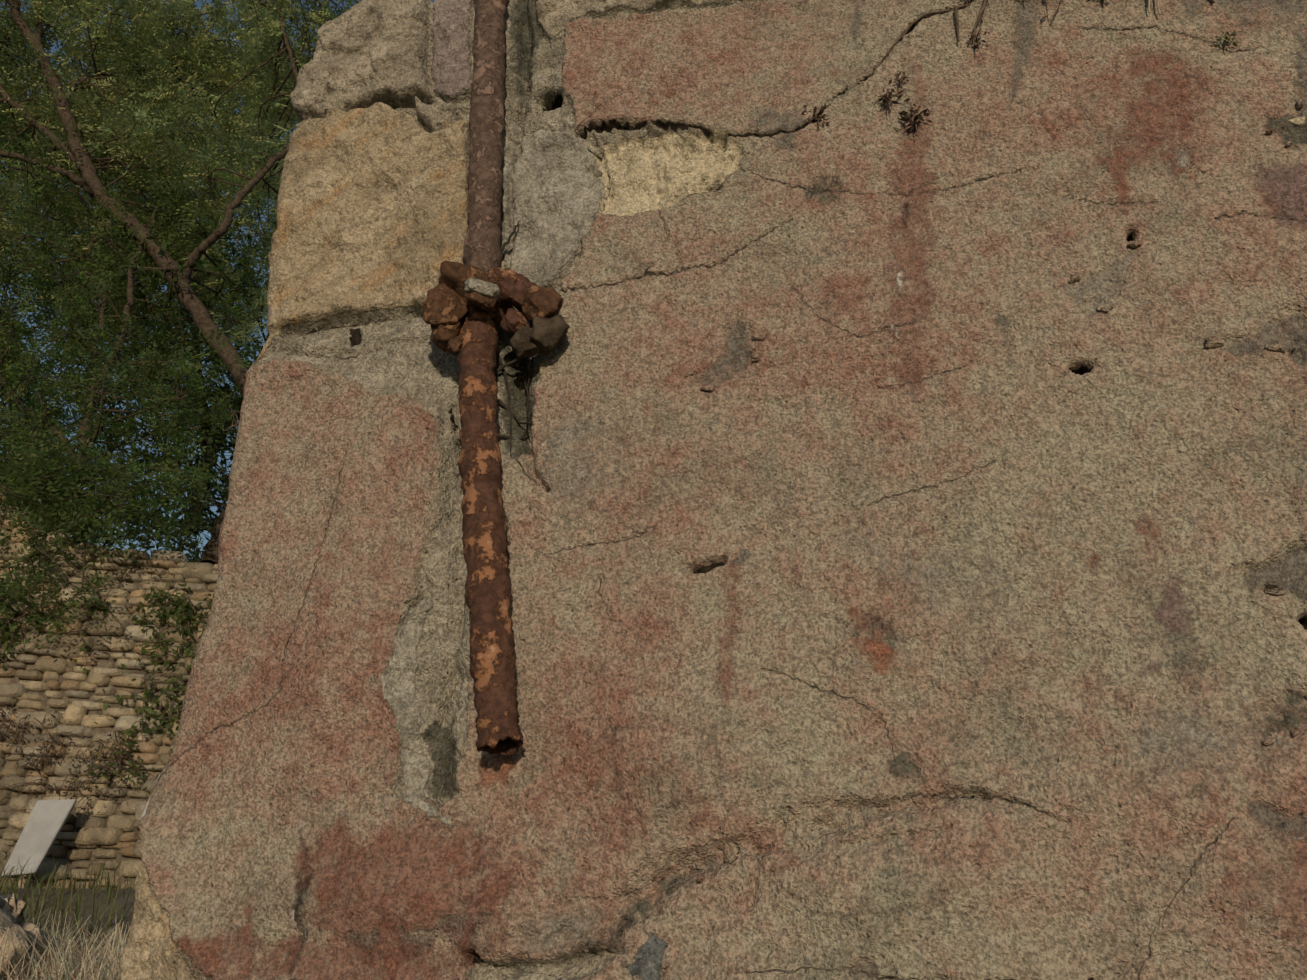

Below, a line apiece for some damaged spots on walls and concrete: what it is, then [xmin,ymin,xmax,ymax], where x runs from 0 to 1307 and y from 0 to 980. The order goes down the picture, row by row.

crack [1083,25,1260,52]
crack [575,0,1021,212]
spalling [586,129,745,217]
crack [1073,197,1159,205]
crack [1215,212,1305,222]
crack [558,209,793,292]
crack [794,289,917,337]
spalling [1204,315,1307,364]
spalling [1245,546,1307,598]
crack [157,442,348,780]
crack [1088,817,1236,980]
crack [745,966,951,980]